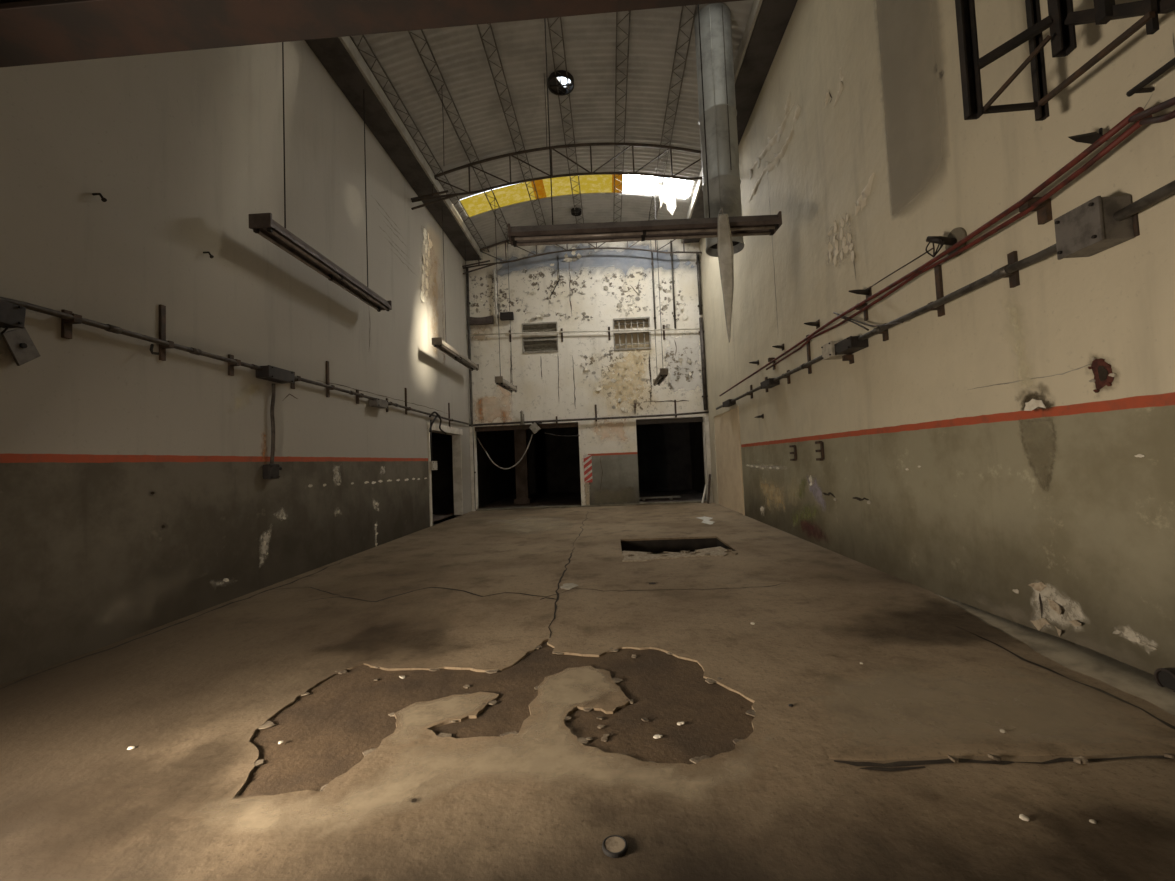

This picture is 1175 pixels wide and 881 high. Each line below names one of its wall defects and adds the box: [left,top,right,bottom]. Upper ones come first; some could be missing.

peeling [471,247,688,328]
peeling [581,350,652,414]
peeling [665,347,701,389]
spalling [261,533,270,563]
crack [274,460,784,637]
flaking render [1013,582,1083,636]
spalling [1113,628,1157,650]
spalling [223,641,758,803]
crack [809,626,1175,772]